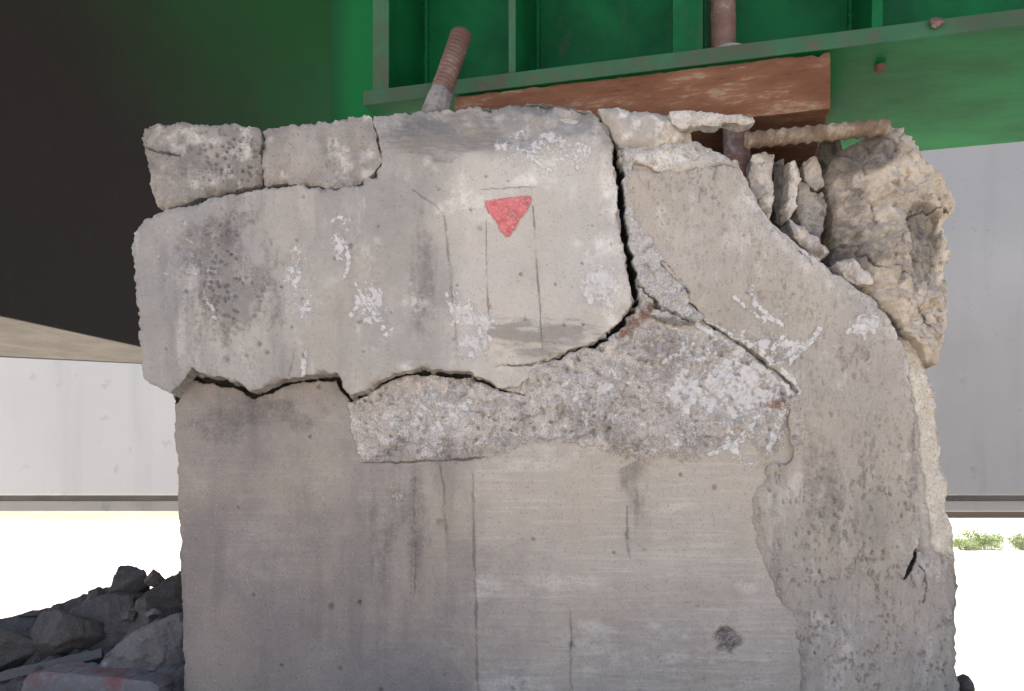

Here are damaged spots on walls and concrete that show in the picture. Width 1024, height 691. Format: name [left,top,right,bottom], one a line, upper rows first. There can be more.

water stain [330,213,394,346]
crack [175,148,765,404]
water stain [444,290,497,359]
spalling [347,118,891,461]
water stain [661,284,822,468]
crack [903,549,927,601]